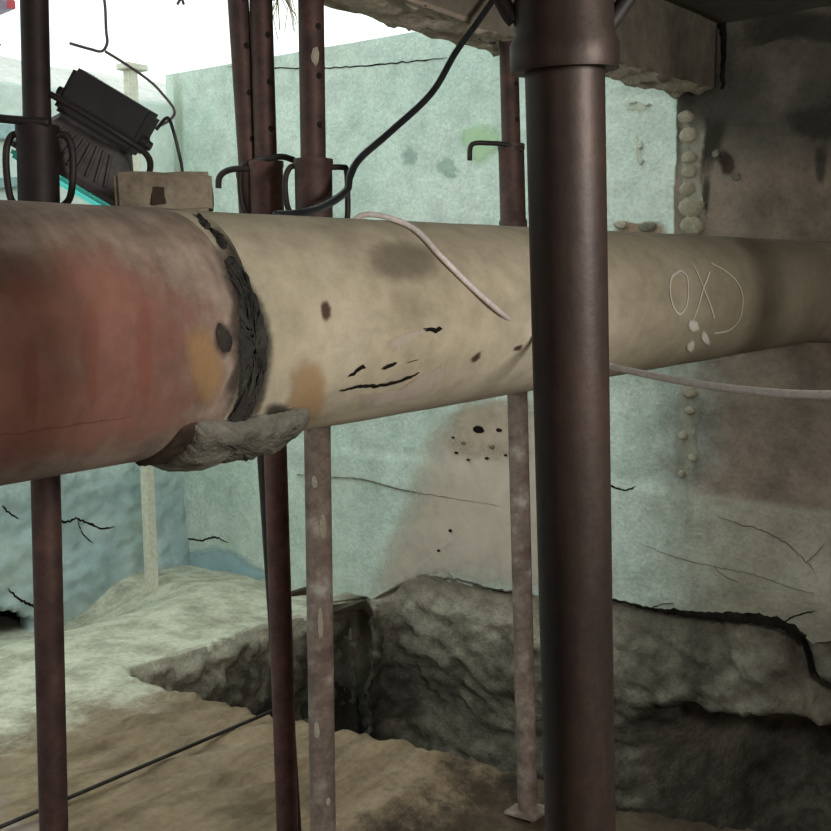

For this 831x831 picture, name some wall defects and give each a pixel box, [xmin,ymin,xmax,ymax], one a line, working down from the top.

crack [424,325,443,333]
crack [340,360,420,391]
crack [333,477,495,506]
crack [62,517,113,543]
crack [718,516,822,572]
crack [7,588,34,608]
spalling [0,610,20,619]